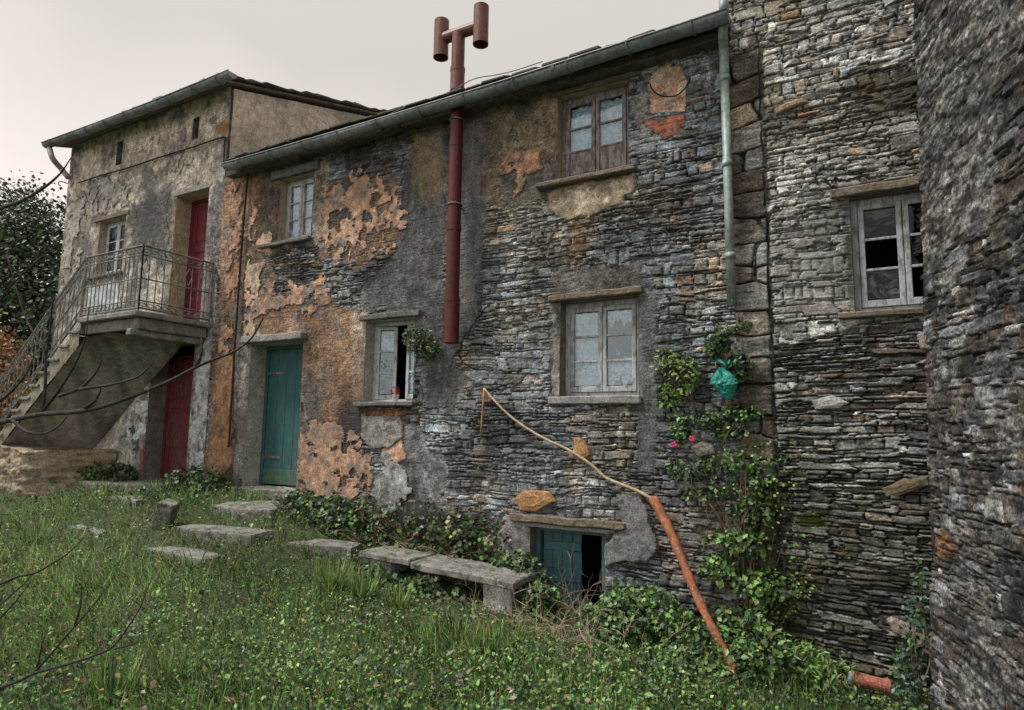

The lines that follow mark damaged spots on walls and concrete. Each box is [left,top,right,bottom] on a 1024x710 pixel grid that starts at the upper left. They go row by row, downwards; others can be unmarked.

spalling [644,64,687,141]
peeling [496,146,543,204]
peeling [188,164,408,477]
peeling [297,413,412,514]